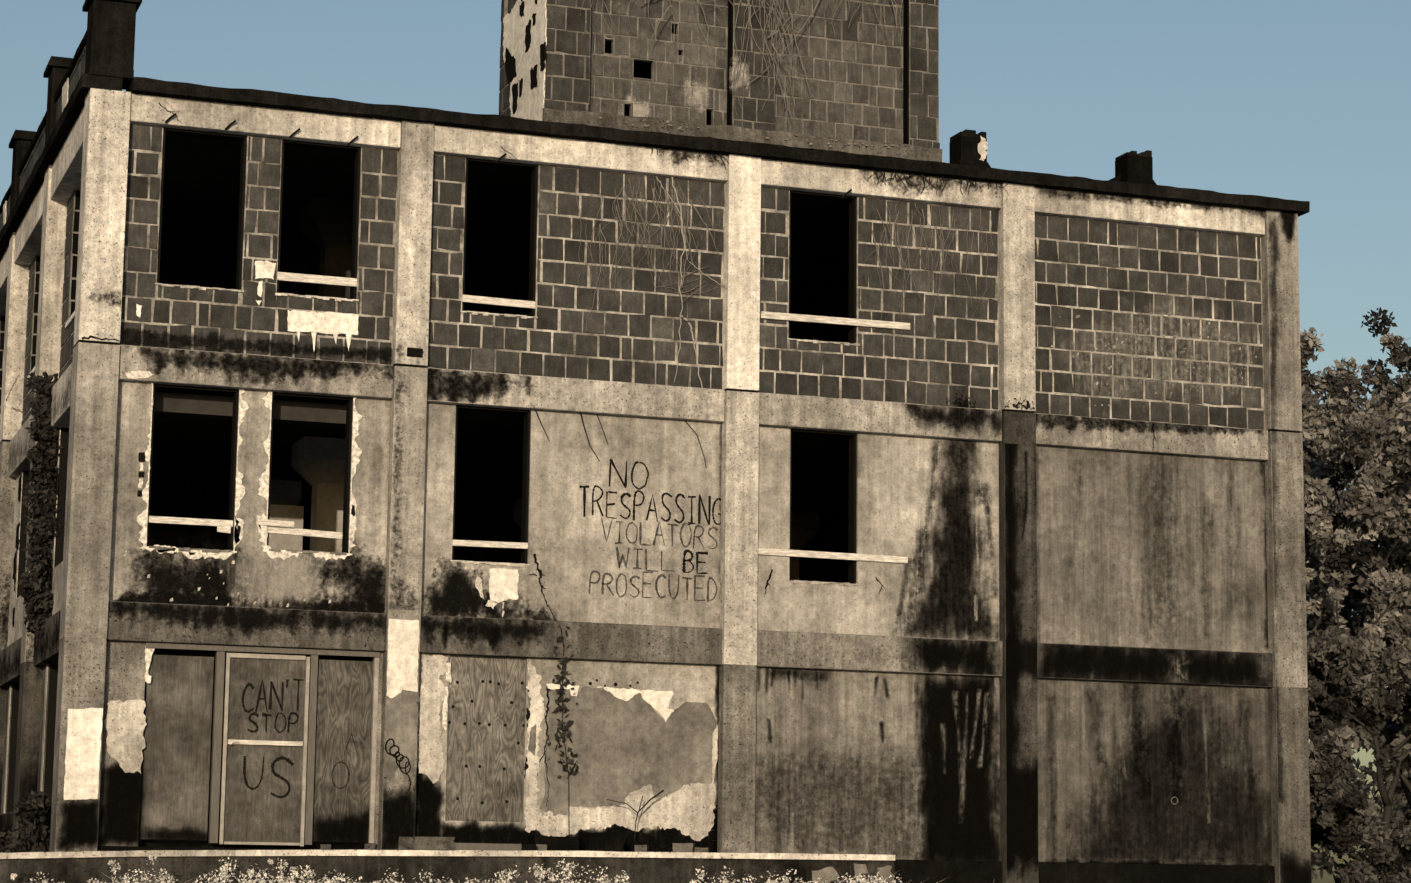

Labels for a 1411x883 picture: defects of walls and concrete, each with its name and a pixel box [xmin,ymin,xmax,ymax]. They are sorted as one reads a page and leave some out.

peeling [503,0,547,121]
leakage [123,328,402,403]
spalling [123,371,362,606]
leakage [108,504,556,651]
peeling [475,573,505,617]
crack [529,554,548,607]
leakage [758,404,1312,883]
peeling [523,659,718,841]